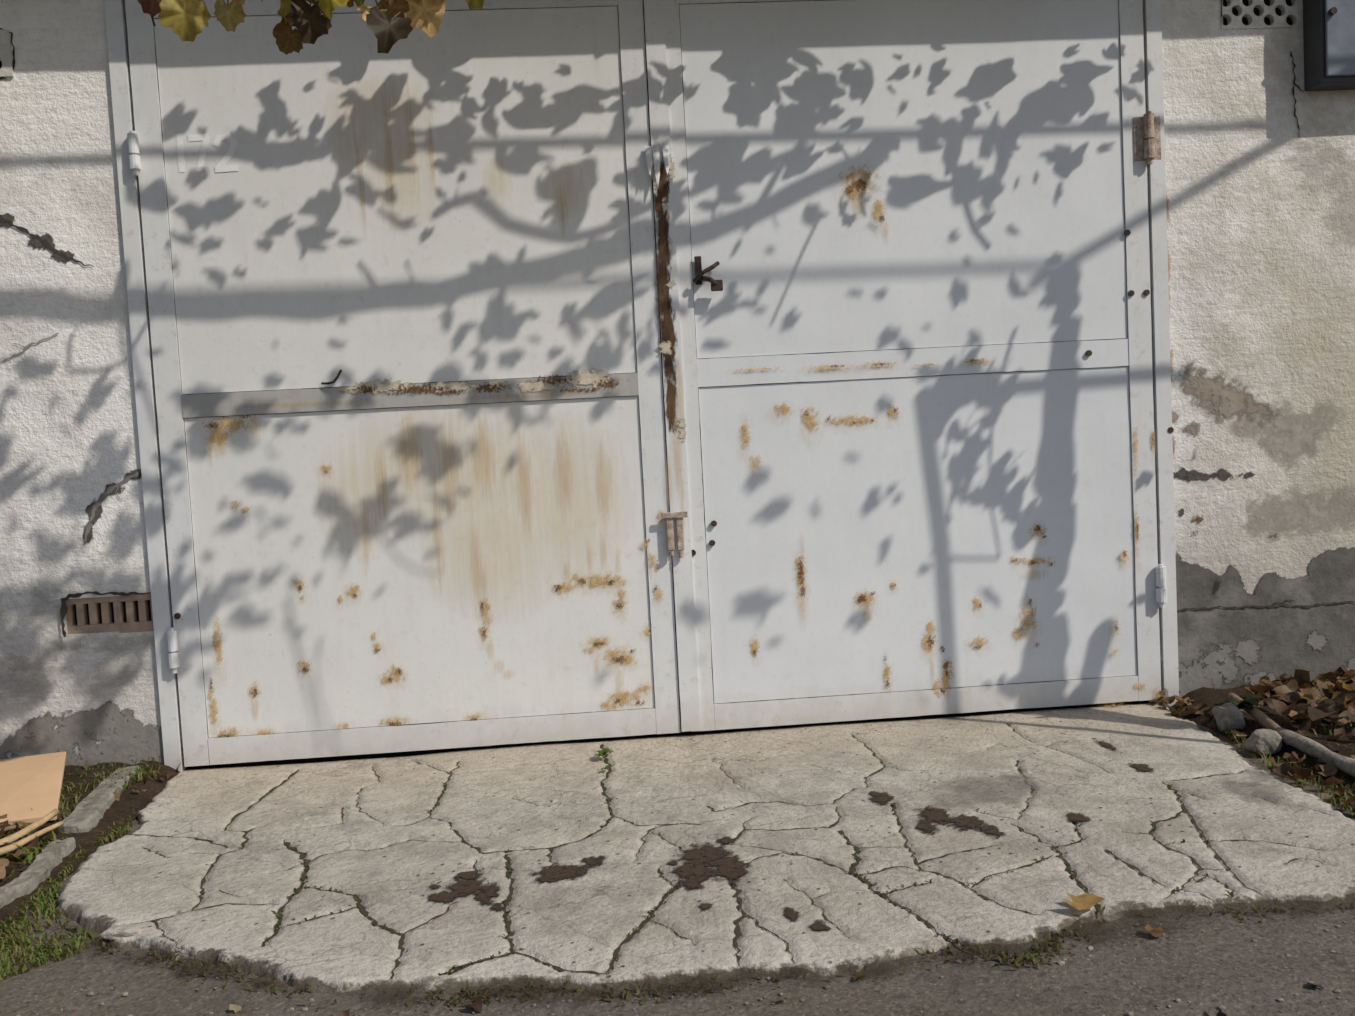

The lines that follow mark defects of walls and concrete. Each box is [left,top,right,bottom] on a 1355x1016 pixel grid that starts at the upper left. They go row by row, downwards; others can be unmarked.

crack [0,32,15,79]
crack [0,213,94,267]
corrosion [651,152,686,442]
peeling [1172,362,1337,467]
crack [83,469,142,545]
flaking render [1173,467,1255,481]
corrosion [551,574,626,608]
corrosion [796,556,806,597]
corrosion [922,622,953,697]
flaking render [1175,547,1355,697]
flaking render [0,700,164,766]
crack [104,725,1333,979]